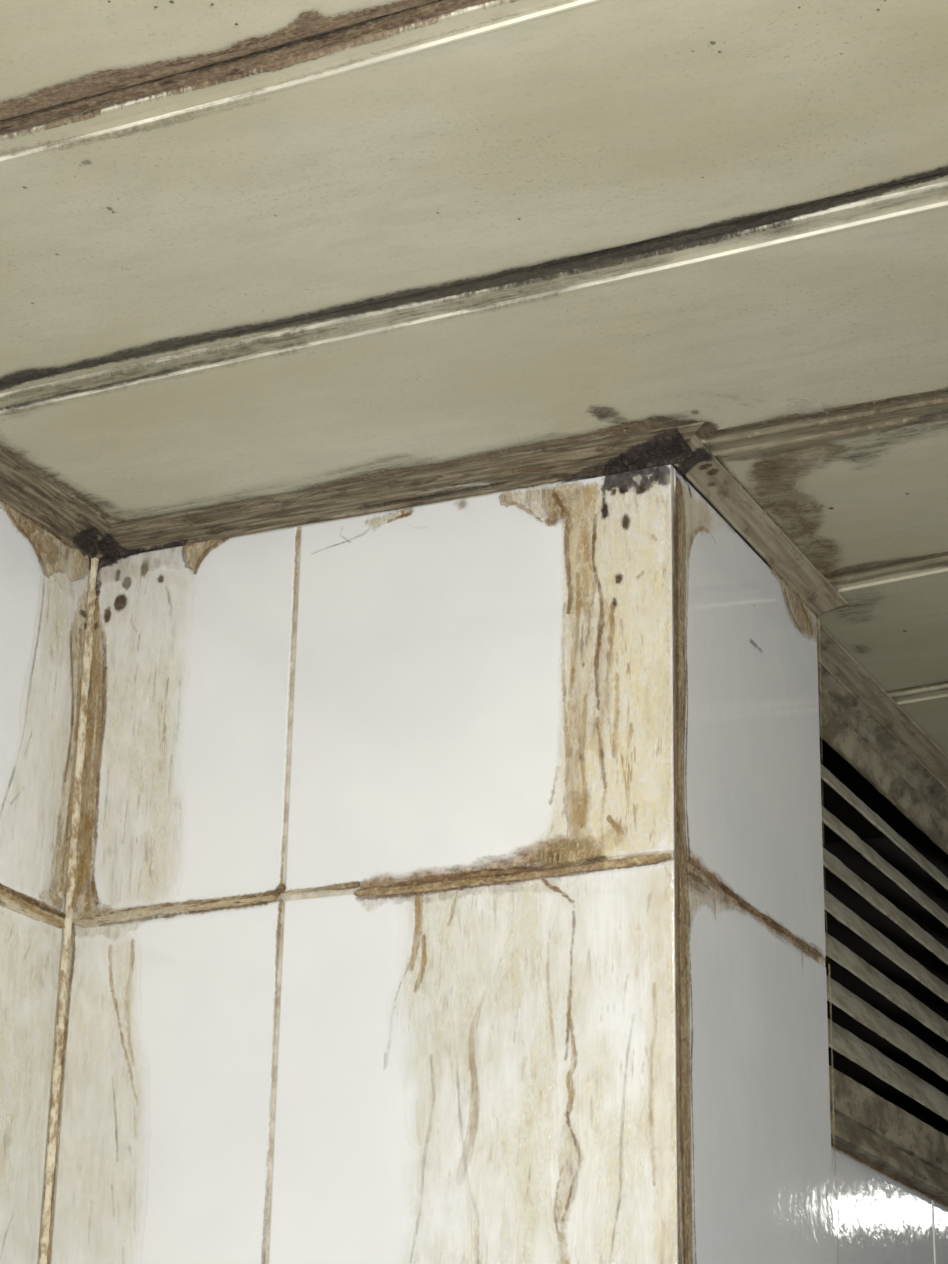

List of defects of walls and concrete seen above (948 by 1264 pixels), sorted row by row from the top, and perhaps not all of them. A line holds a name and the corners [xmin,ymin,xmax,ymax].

leakage [0,166,948,411]
leakage [52,527,188,629]
leakage [361,483,504,510]
leakage [410,895,427,982]
leakage [564,407,718,1264]
leakage [0,884,75,1264]